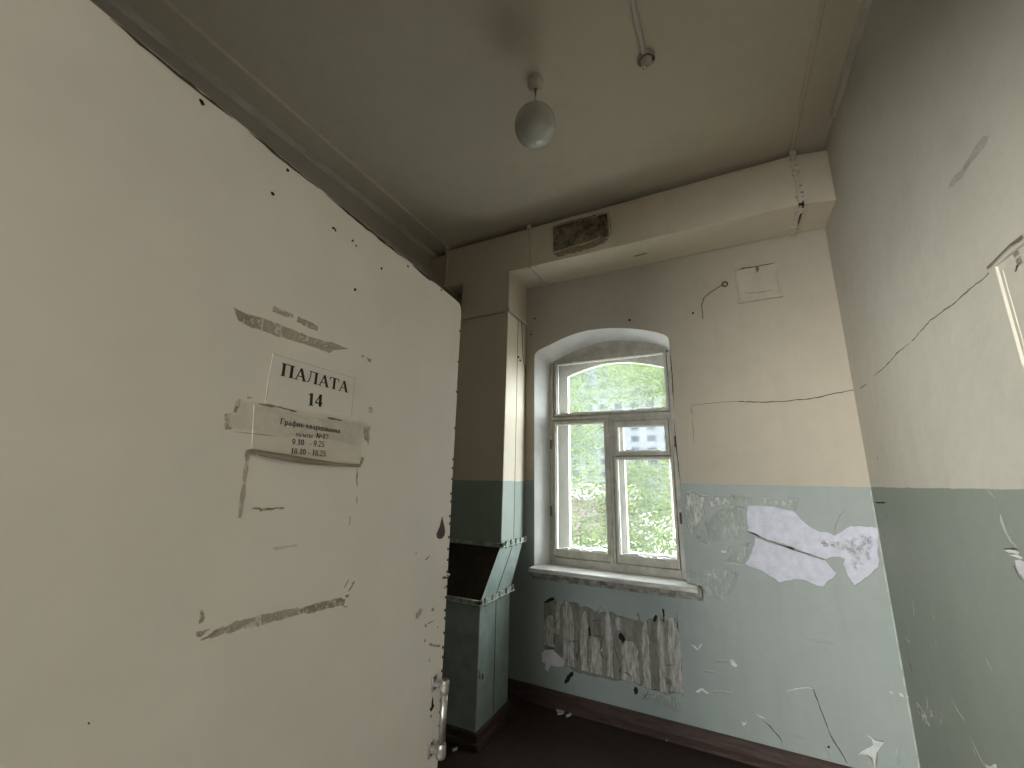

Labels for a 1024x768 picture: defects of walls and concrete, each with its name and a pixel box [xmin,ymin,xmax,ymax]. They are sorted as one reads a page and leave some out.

crack [669,235,1023,484]
crack [788,687,847,762]
peeling [726,490,920,768]
flaking render [1005,550,1024,580]